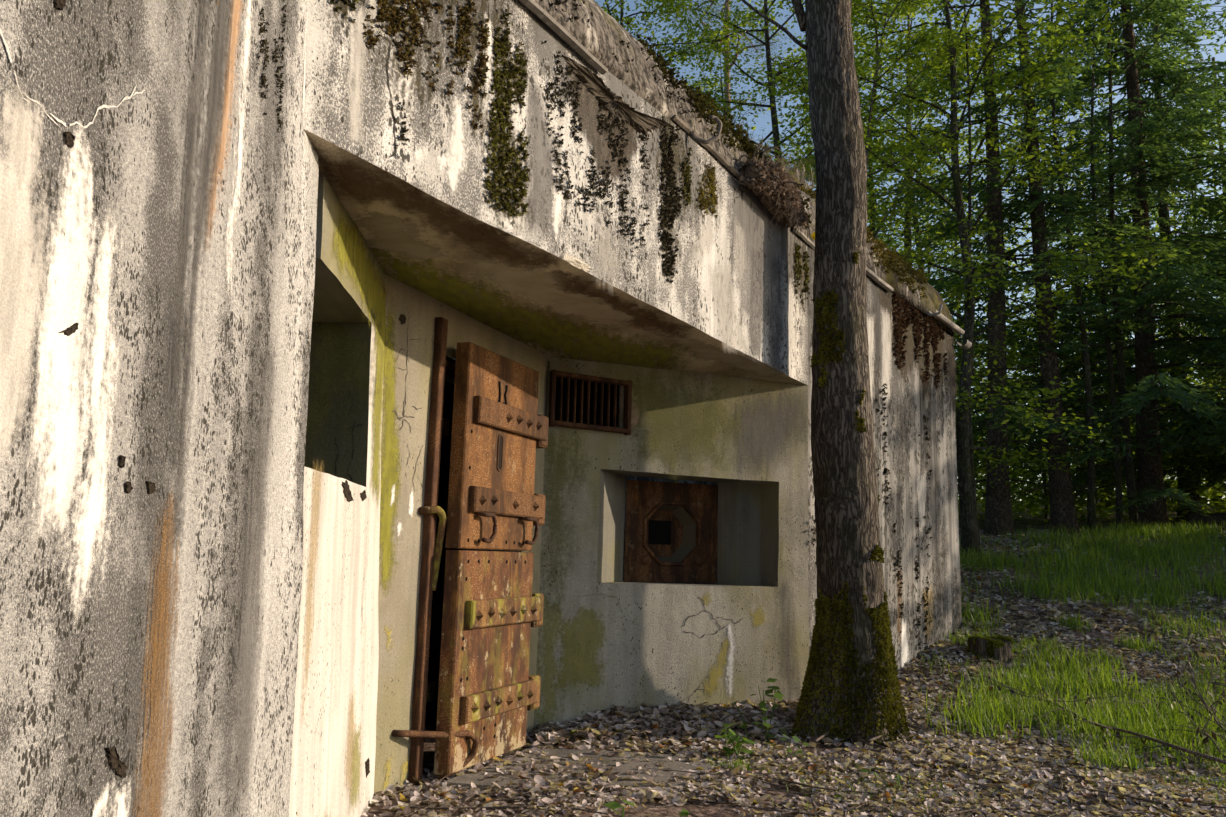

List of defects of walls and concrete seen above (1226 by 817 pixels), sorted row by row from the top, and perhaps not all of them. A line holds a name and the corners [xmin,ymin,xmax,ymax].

crack [0,29,145,128]
rust [207,0,242,234]
damp [348,0,378,141]
damp [414,96,469,192]
damp [483,13,496,131]
damp [526,89,565,241]
damp [567,64,637,184]
damp [0,95,122,612]
damp [750,251,782,366]
damp [867,287,957,420]
rust [134,492,179,817]
crack [682,596,744,639]